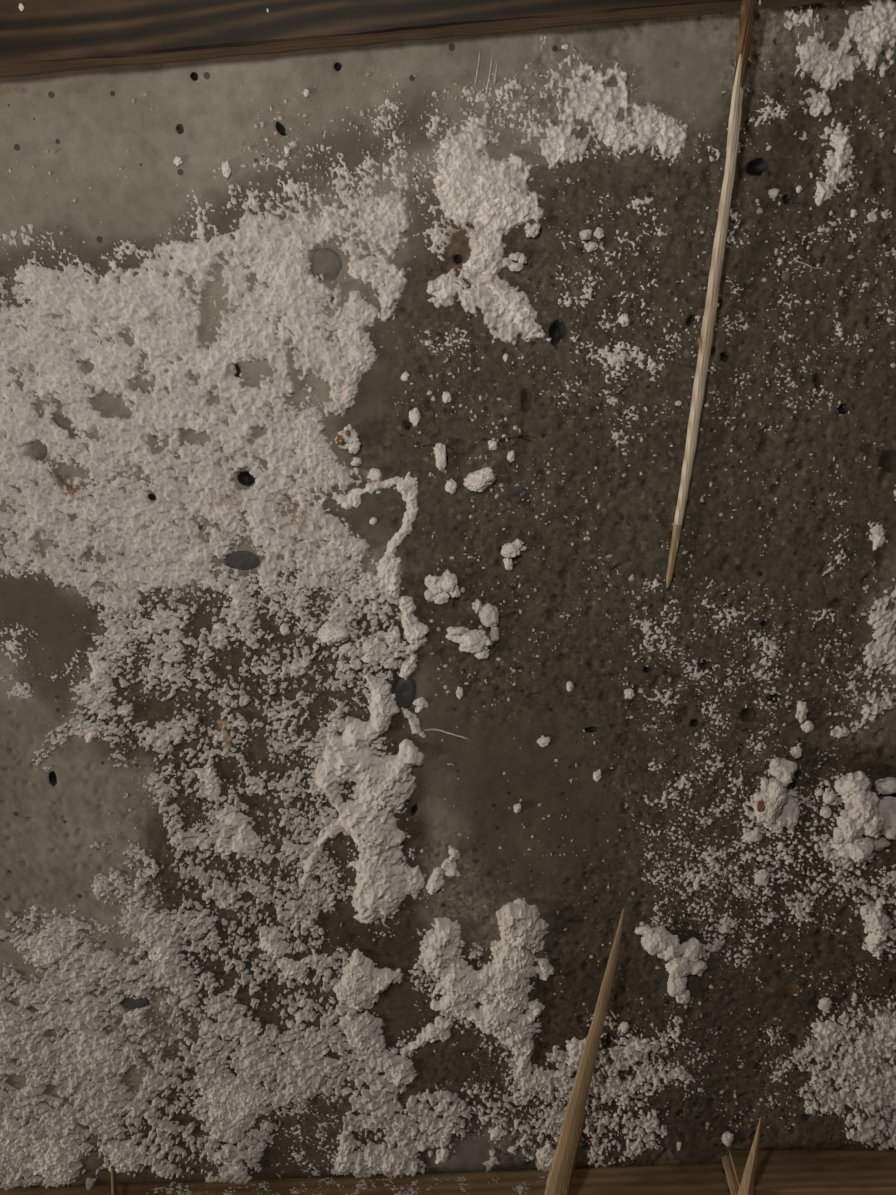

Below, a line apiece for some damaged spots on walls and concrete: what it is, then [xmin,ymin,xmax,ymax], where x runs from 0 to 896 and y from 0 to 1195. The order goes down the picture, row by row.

peeling [726,54,742,151]
spalling [746,158,769,176]
spalling [549,319,565,346]
spalling [879,450,896,473]
peeling [445,478,457,494]
peeling [472,599,499,643]
peeling [790,745,803,759]
peeling [781,797,800,830]
peeling [820,788,835,818]
peeling [634,922,650,935]
peeling [689,960,708,976]